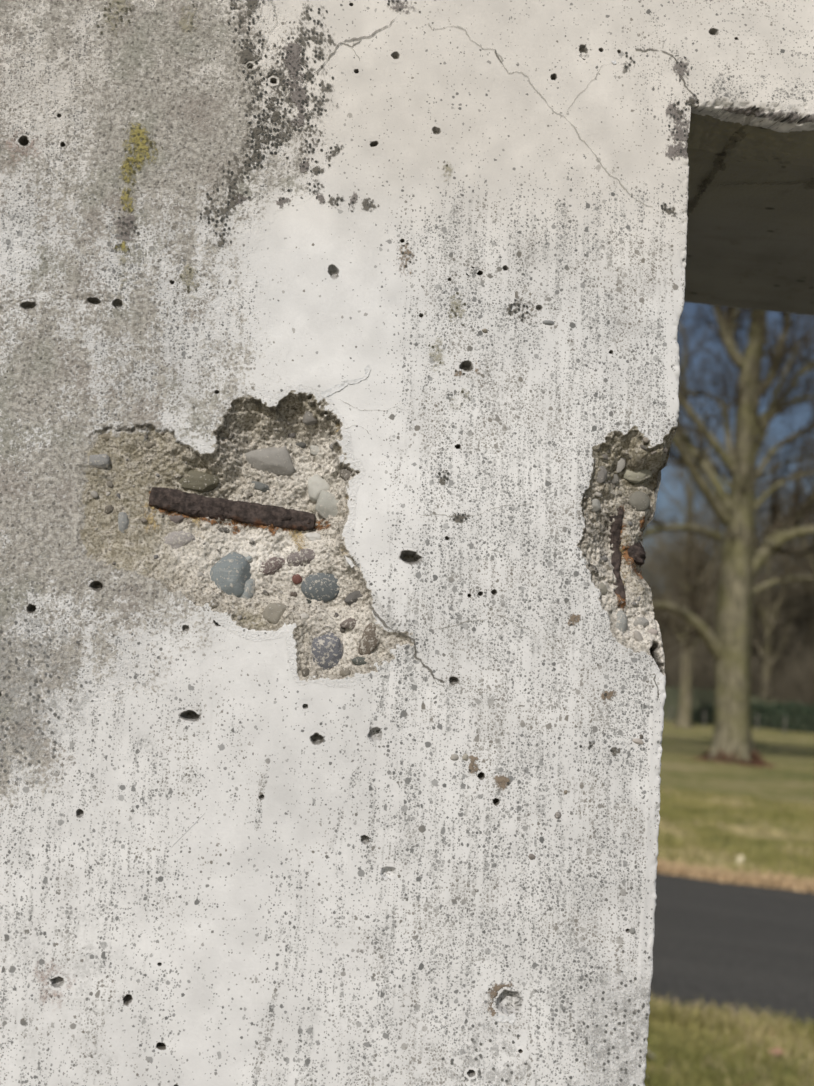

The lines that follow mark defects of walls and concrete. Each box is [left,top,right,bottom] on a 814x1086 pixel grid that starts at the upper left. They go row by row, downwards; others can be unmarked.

crack [311,19,394,77]
leakage [0,0,379,824]
corrosion [146,491,302,551]
spalling [67,364,423,688]
spalling [573,417,678,683]